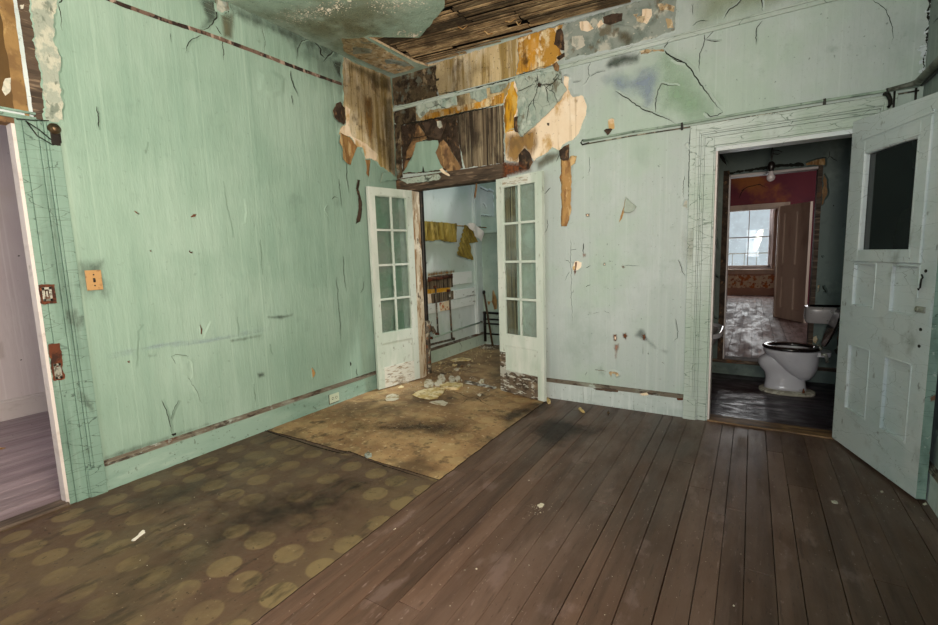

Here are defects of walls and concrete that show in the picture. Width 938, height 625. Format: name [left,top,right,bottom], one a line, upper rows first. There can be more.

spalling [13,0,65,125]
crack [55,0,63,30]
crack [170,2,230,60]
peeling [271,0,351,24]
crack [402,65,551,125]
spalling [332,0,679,226]
crack [573,0,765,221]
crack [923,0,938,68]